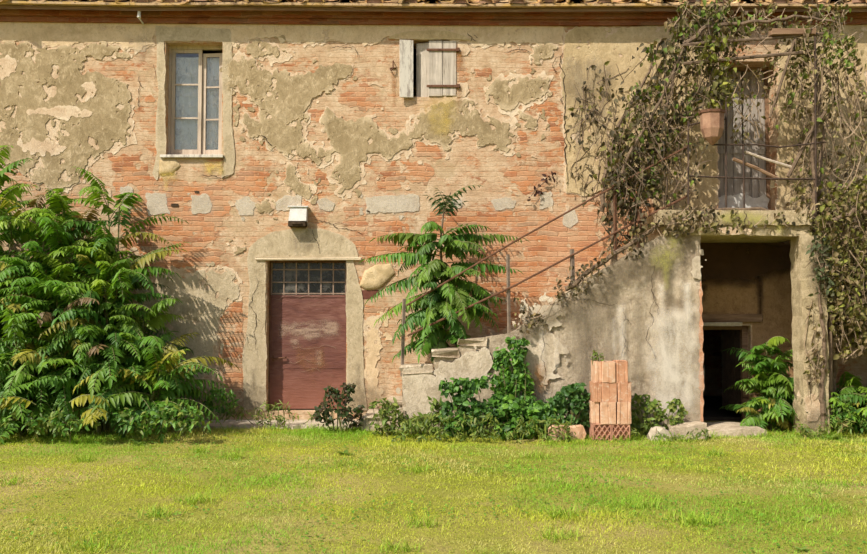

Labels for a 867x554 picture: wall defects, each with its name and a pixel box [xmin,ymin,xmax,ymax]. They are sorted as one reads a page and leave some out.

flaking render [0,22,867,422]
crack [565,257,659,380]